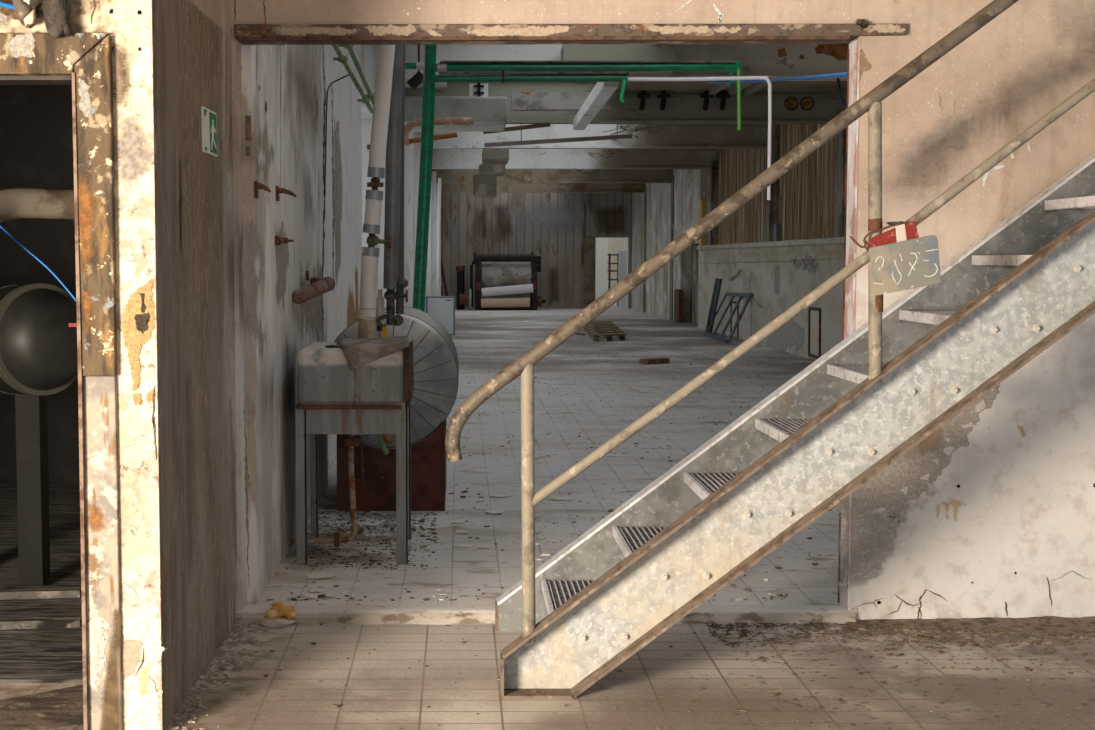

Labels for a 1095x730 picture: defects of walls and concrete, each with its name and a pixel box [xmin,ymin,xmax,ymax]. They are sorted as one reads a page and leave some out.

corrosion [78,183,94,261]
corrosion [84,292,92,325]
spalling [122,278,157,460]
peeling [837,384,1000,588]
crack [851,589,944,619]
crack [1047,571,1093,607]